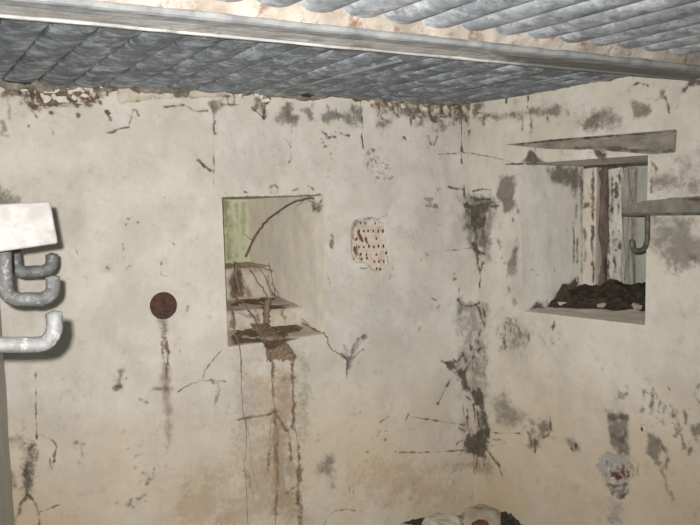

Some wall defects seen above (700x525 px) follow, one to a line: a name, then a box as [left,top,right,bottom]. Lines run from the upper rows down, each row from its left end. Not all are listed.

peeling [1,86,111,118]
leakage [276,103,313,125]
leakage [322,100,499,133]
leakage [510,96,560,120]
leakage [586,111,615,127]
spalling [351,217,388,271]
leakage [448,176,519,271]
leakage [441,345,502,474]
leakage [608,413,629,455]
leakage [647,434,668,465]
leakage [18,466,34,514]
spalling [597,453,632,499]